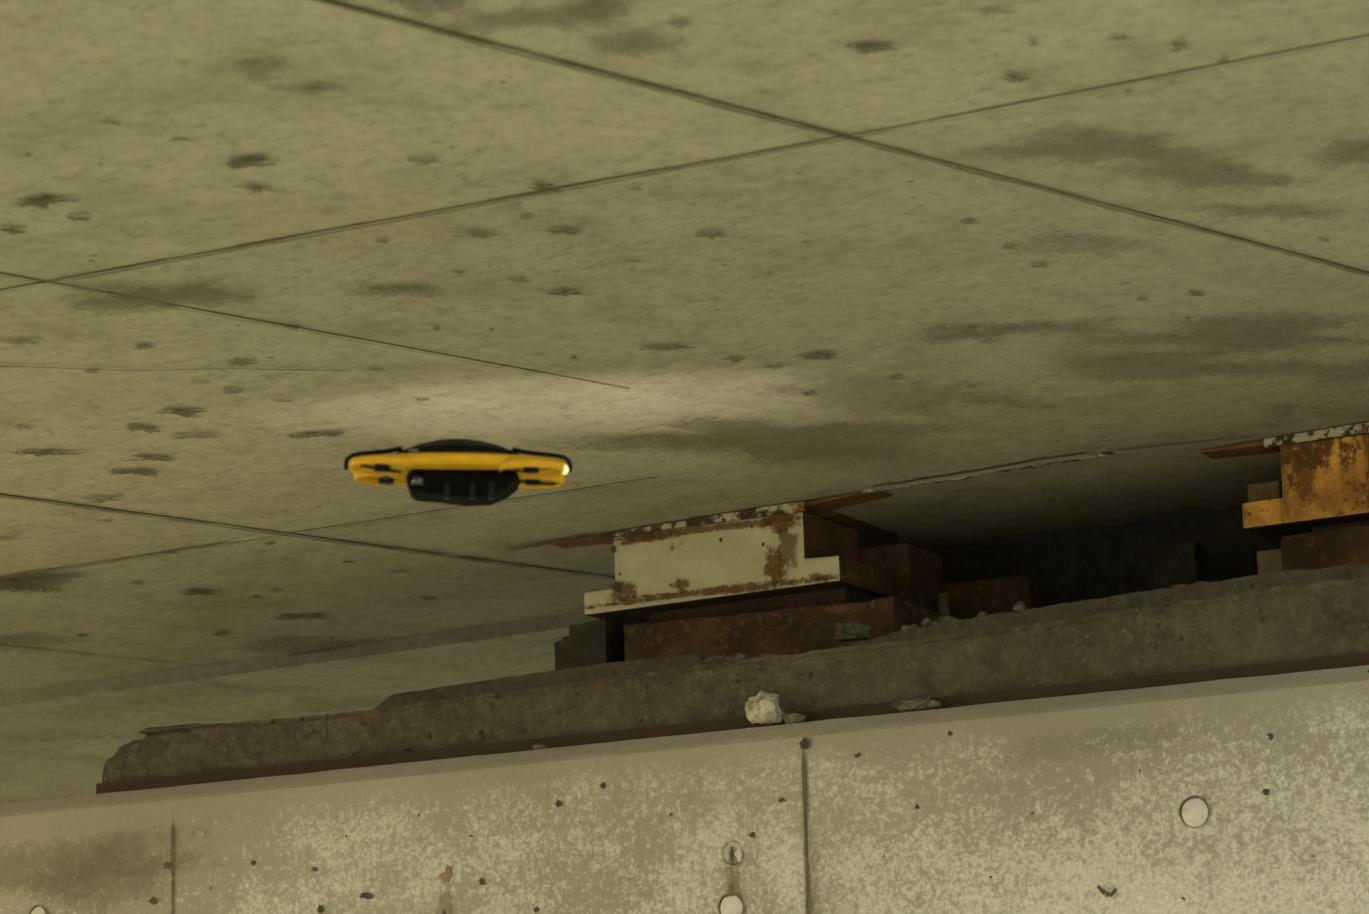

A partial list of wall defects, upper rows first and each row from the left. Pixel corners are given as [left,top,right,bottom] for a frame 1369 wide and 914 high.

corrosion [508,513,863,609]